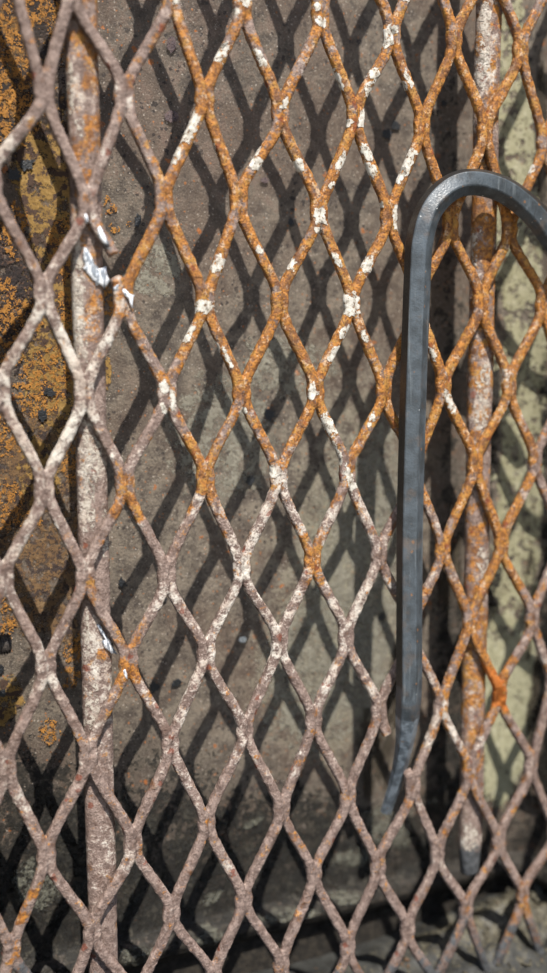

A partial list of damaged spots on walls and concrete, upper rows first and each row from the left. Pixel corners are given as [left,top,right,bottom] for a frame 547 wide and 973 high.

rust [0,0,61,144]
rust [0,41,81,689]
rust [0,673,25,727]
rust [38,718,63,745]